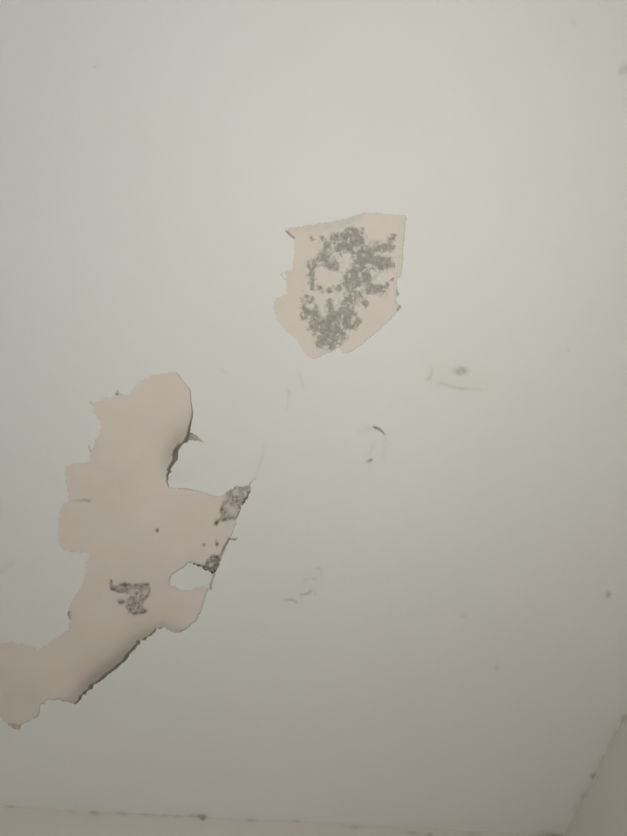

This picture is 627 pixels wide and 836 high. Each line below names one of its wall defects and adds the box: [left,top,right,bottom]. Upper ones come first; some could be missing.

peeling [273,212,406,358]
peeling [0,372,251,730]